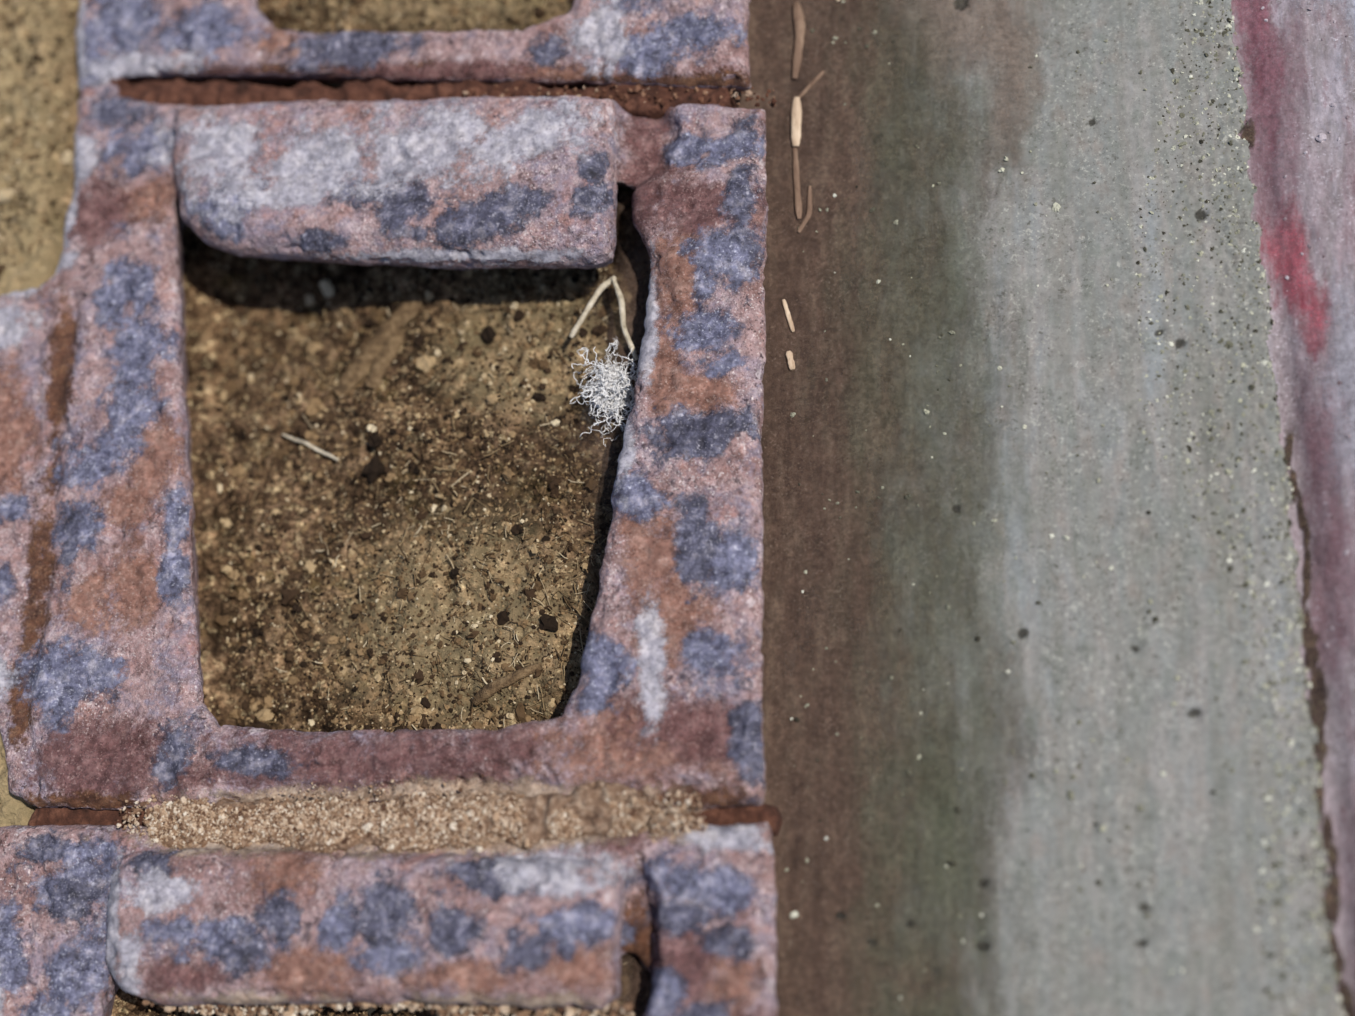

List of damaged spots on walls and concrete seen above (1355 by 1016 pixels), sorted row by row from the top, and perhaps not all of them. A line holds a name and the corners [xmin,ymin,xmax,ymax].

corrosion [0,0,978,1016]